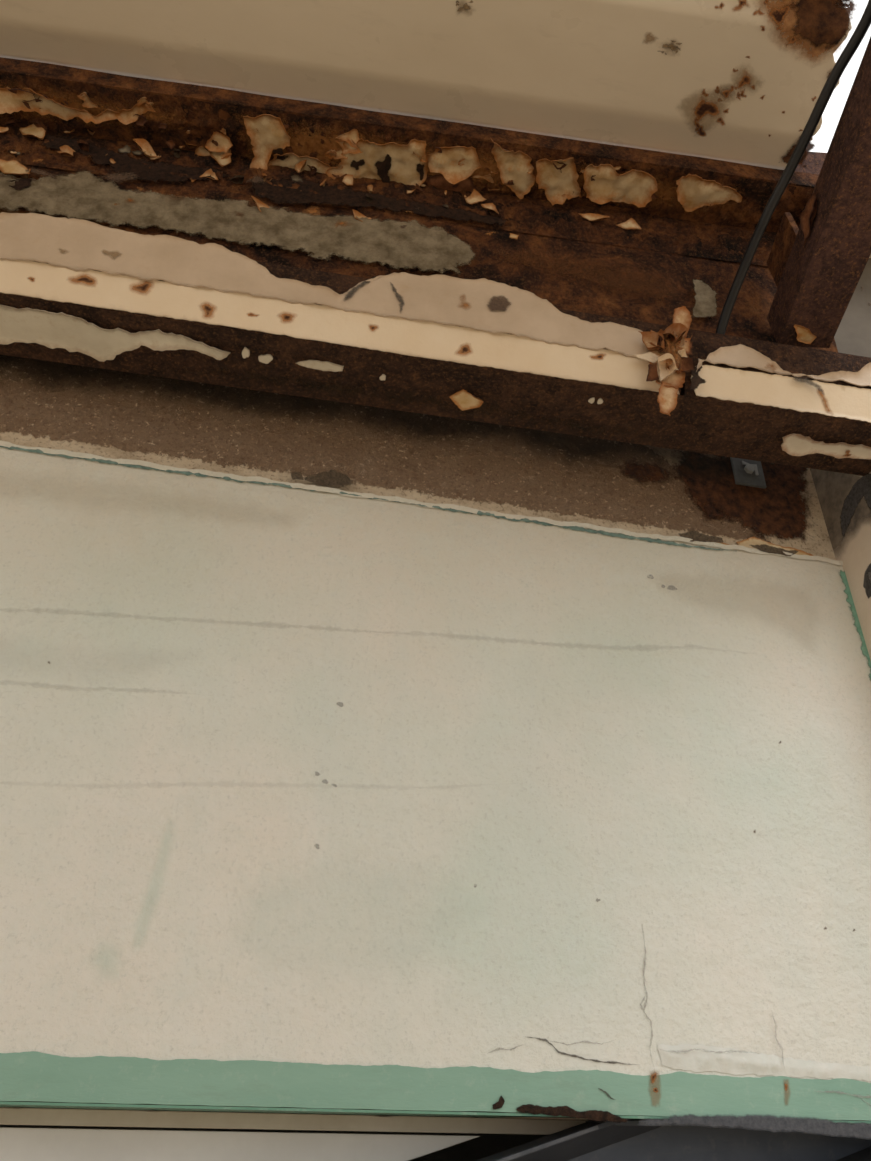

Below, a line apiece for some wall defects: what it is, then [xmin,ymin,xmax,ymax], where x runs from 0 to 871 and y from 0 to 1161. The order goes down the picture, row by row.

corrosion [715,0,857,59]
corrosion [0,69,818,266]
peeling [676,174,742,212]
peeling [0,87,661,392]
corrosion [71,275,95,285]
corrosion [132,282,152,293]
corrosion [0,294,871,542]
peeling [449,389,484,411]
peeling [691,344,871,423]
peeling [781,434,871,459]
leakage [810,468,871,552]
crack [529,1037,624,1100]